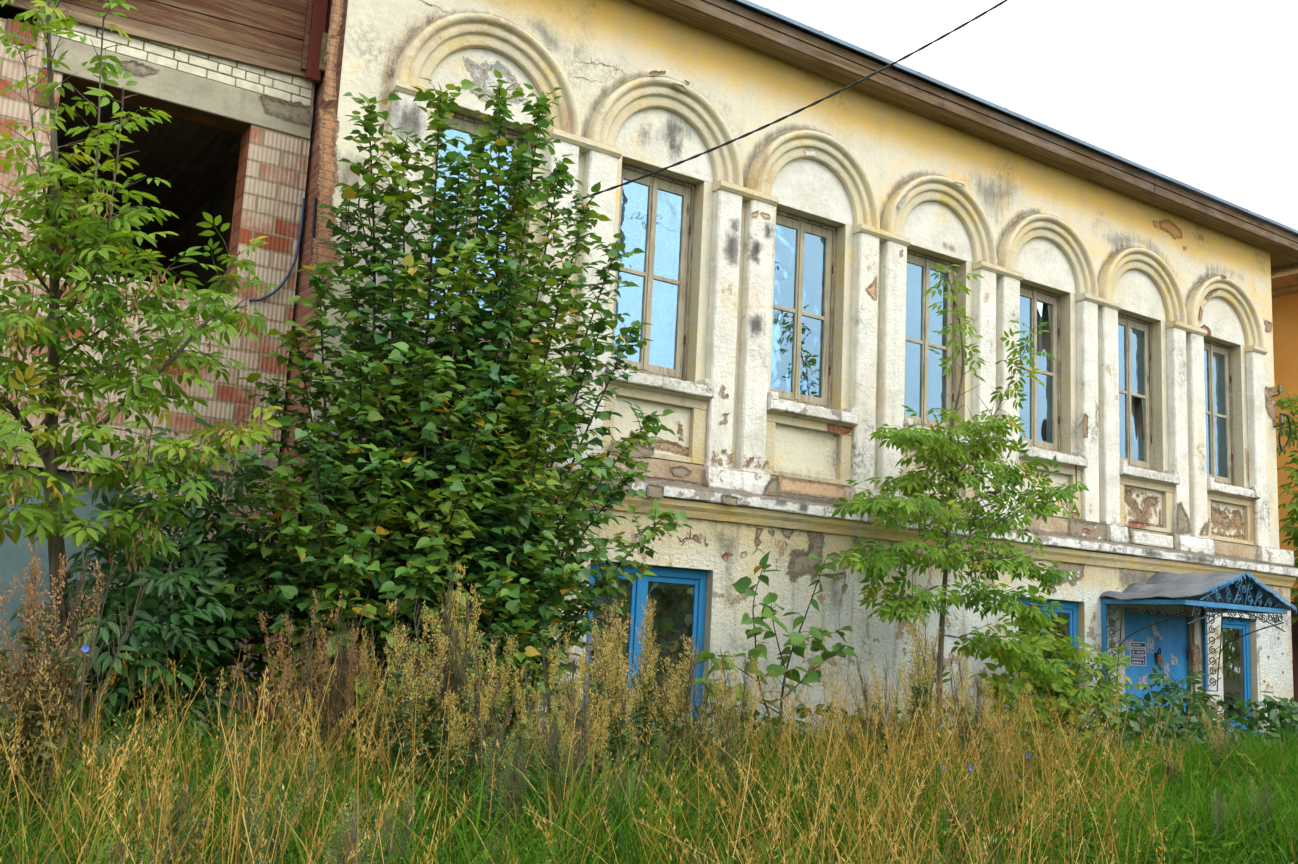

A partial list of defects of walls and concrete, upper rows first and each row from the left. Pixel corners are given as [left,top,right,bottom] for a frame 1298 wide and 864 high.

peeling [722,524,848,592]